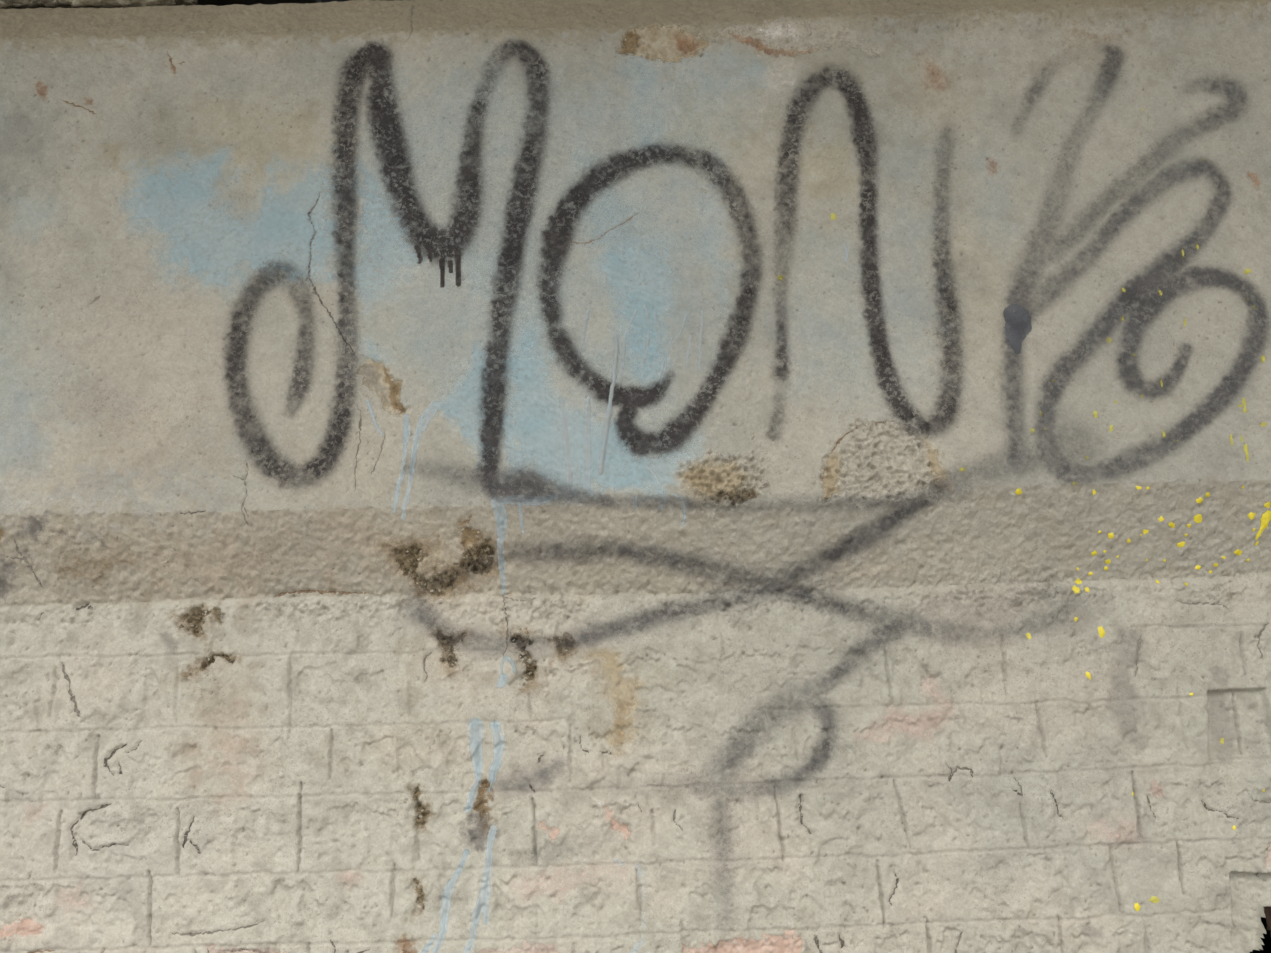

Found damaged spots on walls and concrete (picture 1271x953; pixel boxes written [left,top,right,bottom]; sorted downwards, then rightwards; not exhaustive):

spalling [618,25,709,63]
crack [305,193,358,359]
spalling [359,359,409,417]
spalling [1250,906,1271,953]